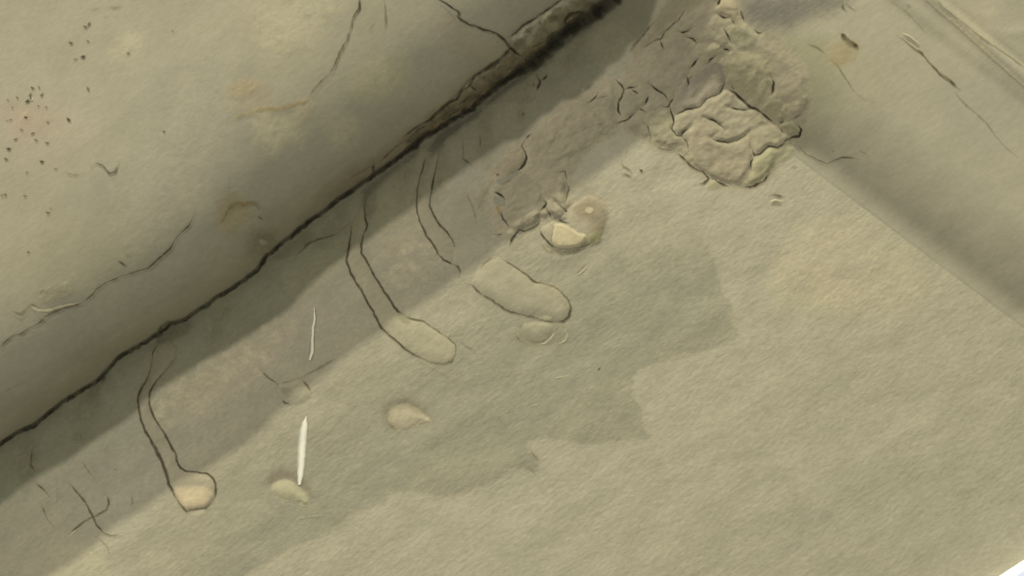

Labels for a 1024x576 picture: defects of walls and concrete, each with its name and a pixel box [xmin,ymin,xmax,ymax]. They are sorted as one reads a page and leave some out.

crack [72,487,112,536]
crack [0,0,622,512]
damp [194,238,737,576]